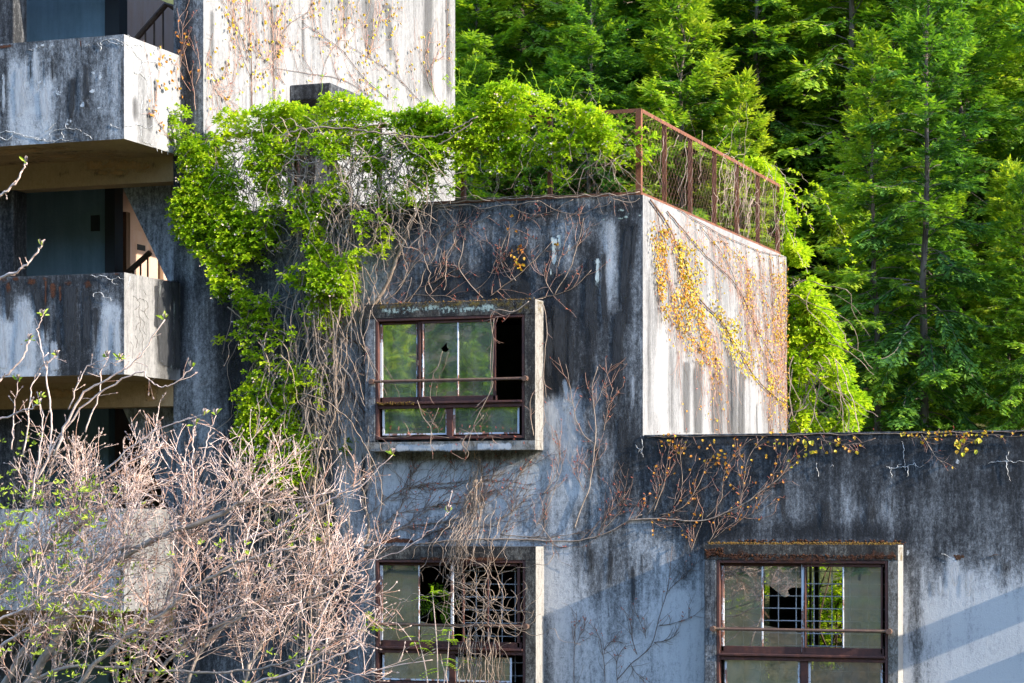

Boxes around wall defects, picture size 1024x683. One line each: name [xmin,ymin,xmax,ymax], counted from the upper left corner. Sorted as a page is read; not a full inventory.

water stain [2,47,53,118]
water stain [68,64,89,120]
water stain [133,81,157,127]
water stain [0,282,121,370]
water stain [154,279,183,369]
water stain [426,245,521,298]
water stain [545,235,577,456]
water stain [584,223,637,403]
water stain [396,443,463,451]
water stain [650,362,826,510]
water stain [190,503,209,588]